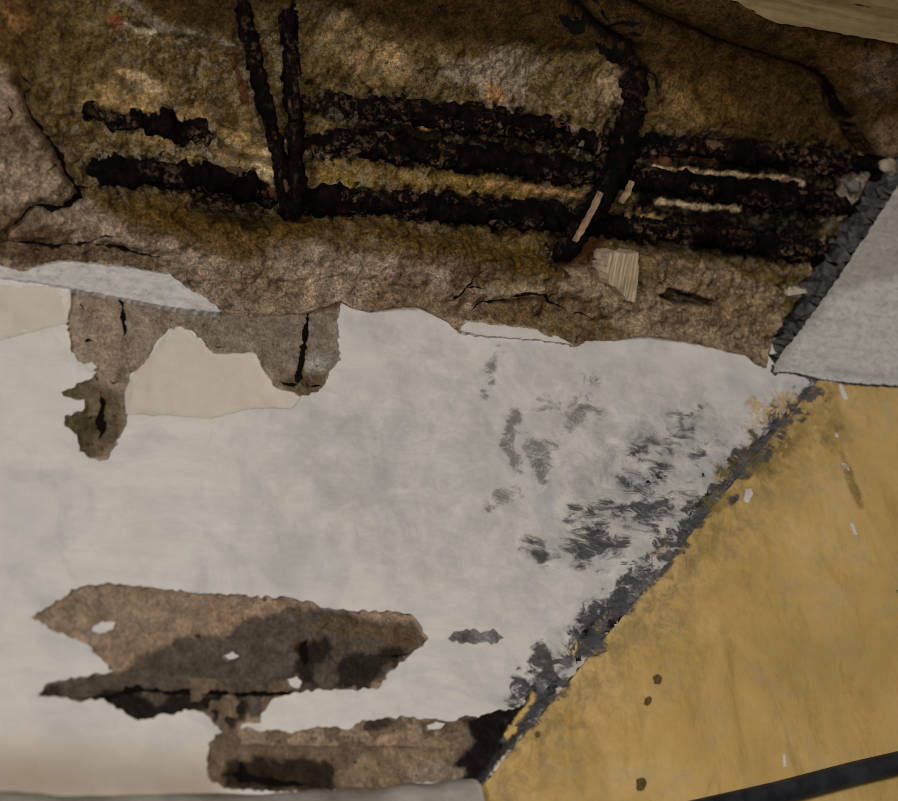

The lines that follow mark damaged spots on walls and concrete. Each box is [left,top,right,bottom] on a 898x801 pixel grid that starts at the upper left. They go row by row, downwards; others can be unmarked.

spalling [0,0,882,461]
corrosion [558,236,607,267]
corrosion [640,140,725,177]
damp [477,378,831,785]
flaking render [32,584,540,793]